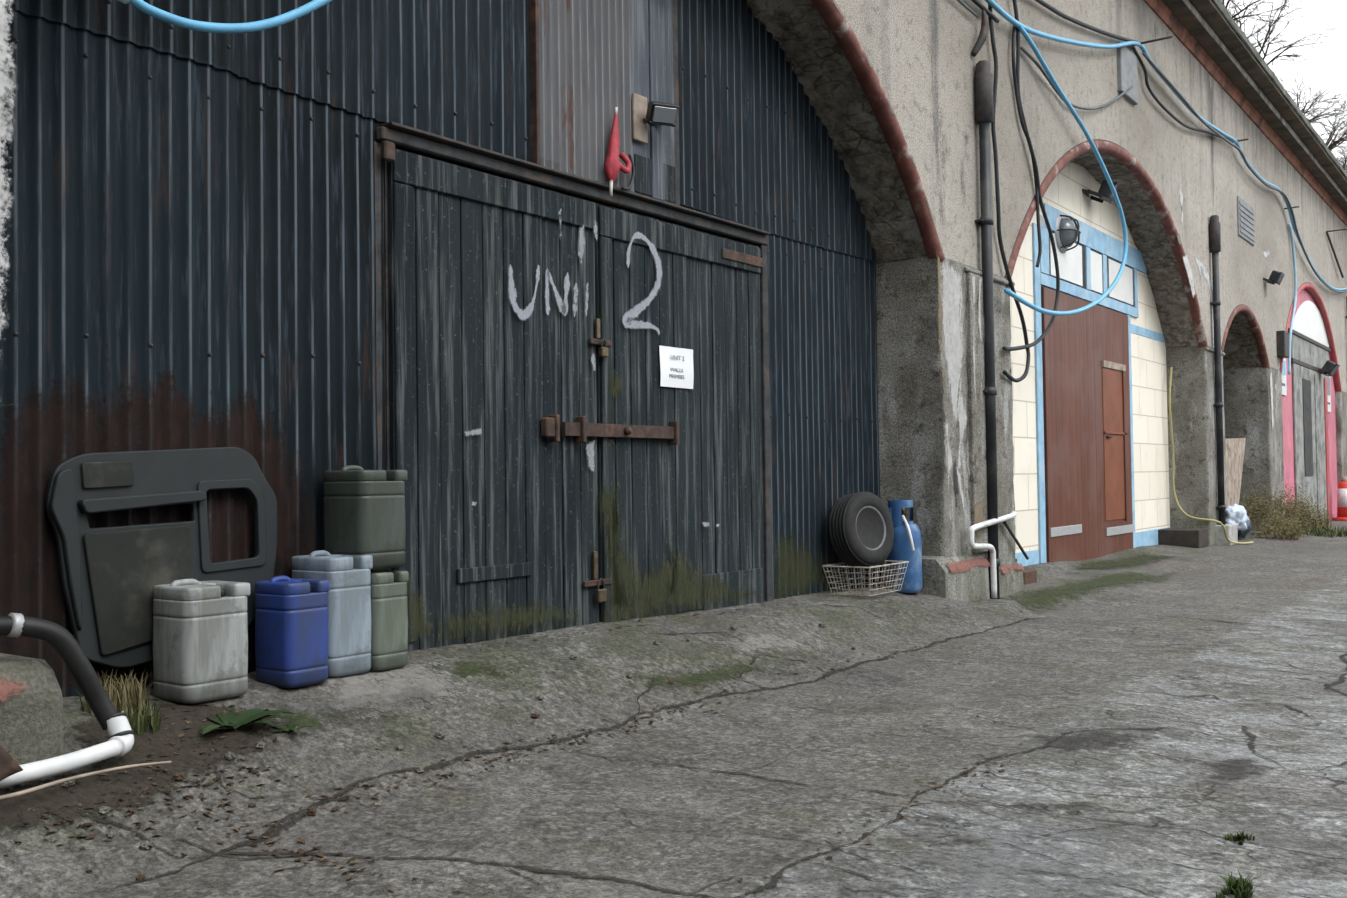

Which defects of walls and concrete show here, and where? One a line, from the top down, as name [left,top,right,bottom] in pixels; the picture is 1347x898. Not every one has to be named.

rust [0,374,319,637]
rust [0,636,76,697]
rust [90,661,152,685]
crack [1203,653,1347,696]
crack [48,617,1167,898]
crack [1176,695,1347,771]